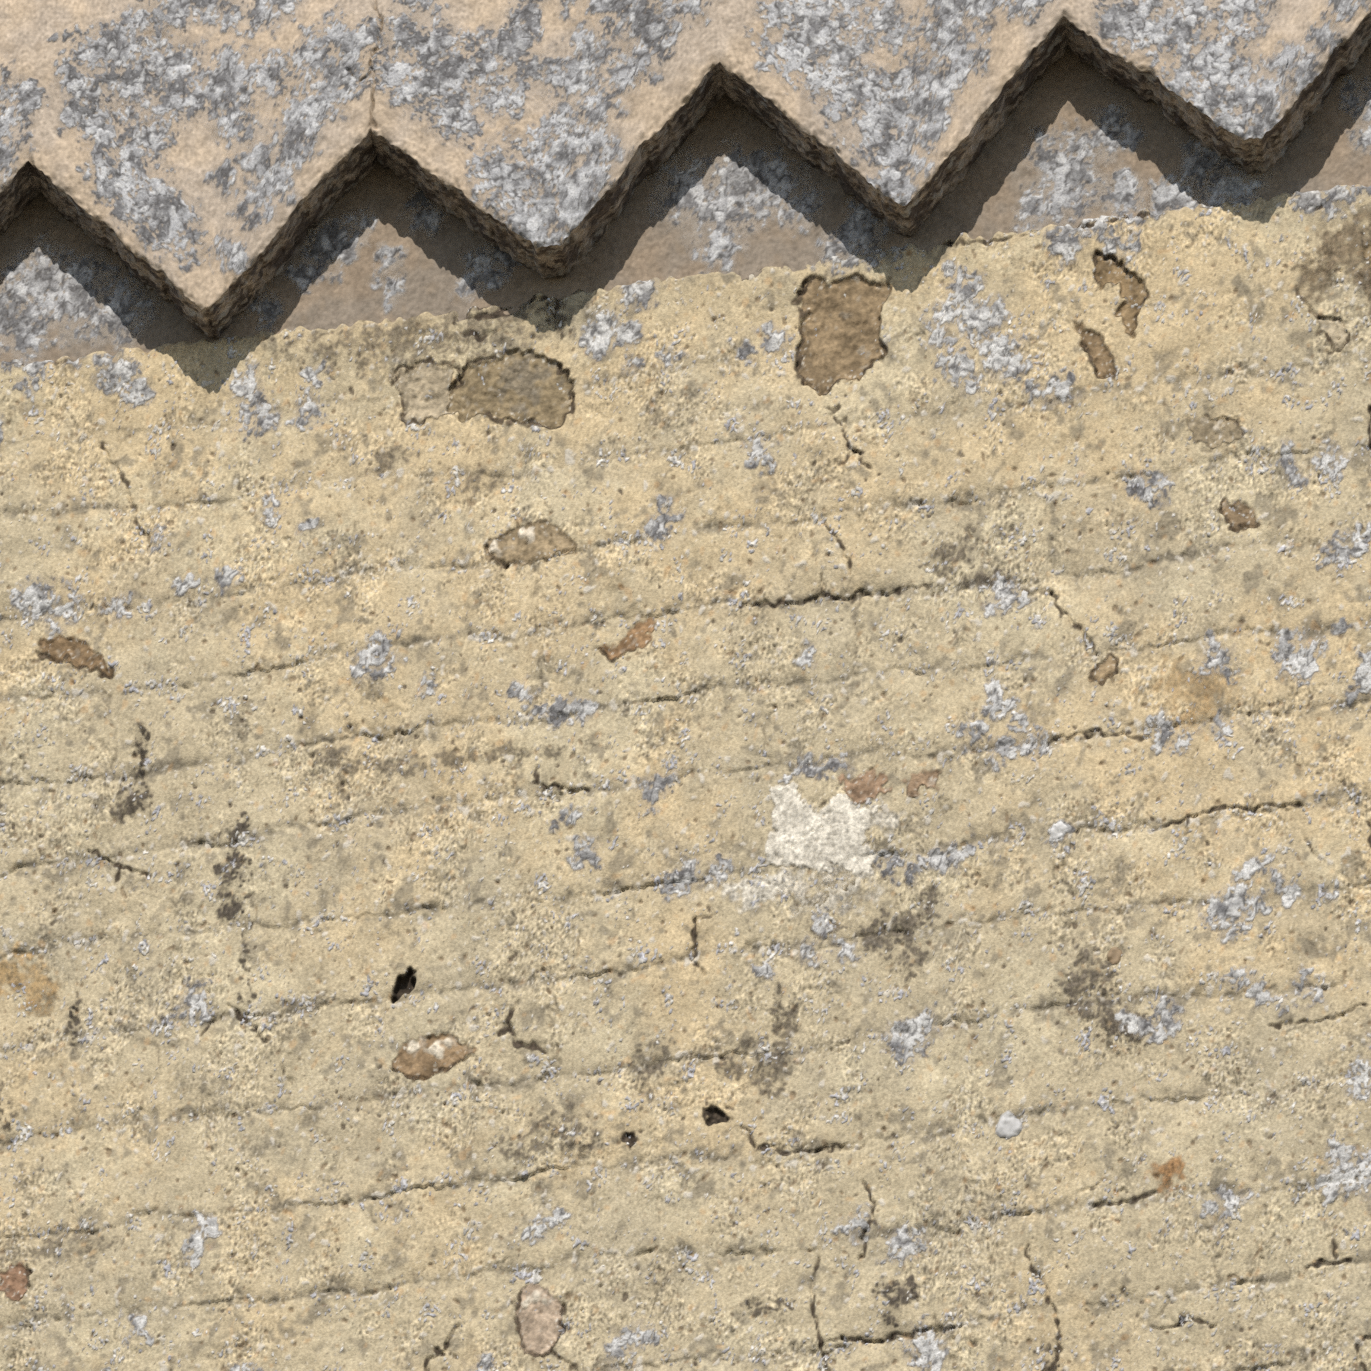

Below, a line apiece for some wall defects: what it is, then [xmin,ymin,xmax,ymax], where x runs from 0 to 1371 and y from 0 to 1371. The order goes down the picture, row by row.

spalling [390,349,575,429]
spalling [791,274,892,396]
spalling [1076,322,1117,379]
spalling [1093,250,1150,337]
spalling [1295,286,1350,352]
spalling [484,519,576,569]
spalling [35,635,114,678]
spalling [392,1033,477,1080]
spalling [515,1284,577,1370]
crack [811,1260,954,1371]
crack [1025,1245,1062,1371]